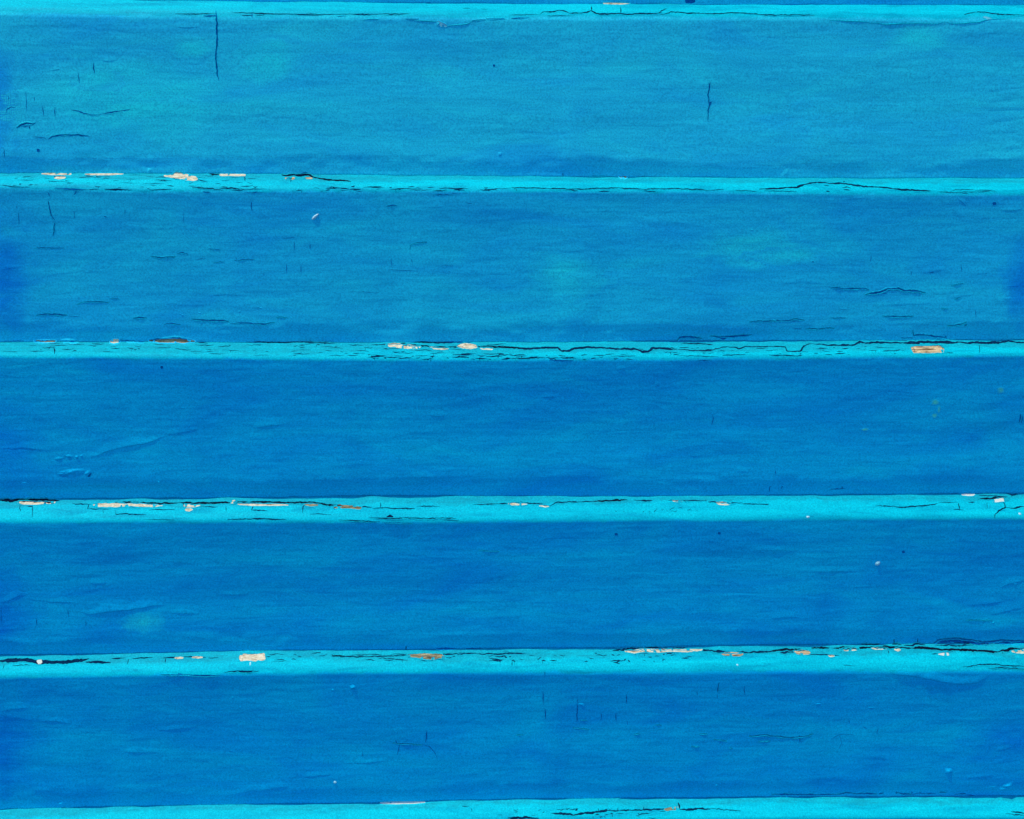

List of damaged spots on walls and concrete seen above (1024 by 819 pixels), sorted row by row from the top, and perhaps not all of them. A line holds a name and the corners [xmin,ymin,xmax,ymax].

crack [312,10,411,18]
crack [515,6,817,19]
crack [964,10,1024,18]
crack [175,10,273,80]
peeling [161,171,246,183]
crack [297,181,997,207]
crack [5,266,1024,361]
peeling [375,341,520,351]
peeling [910,344,945,355]
peeling [72,499,415,512]
peeling [238,652,267,664]
peeling [624,647,703,659]